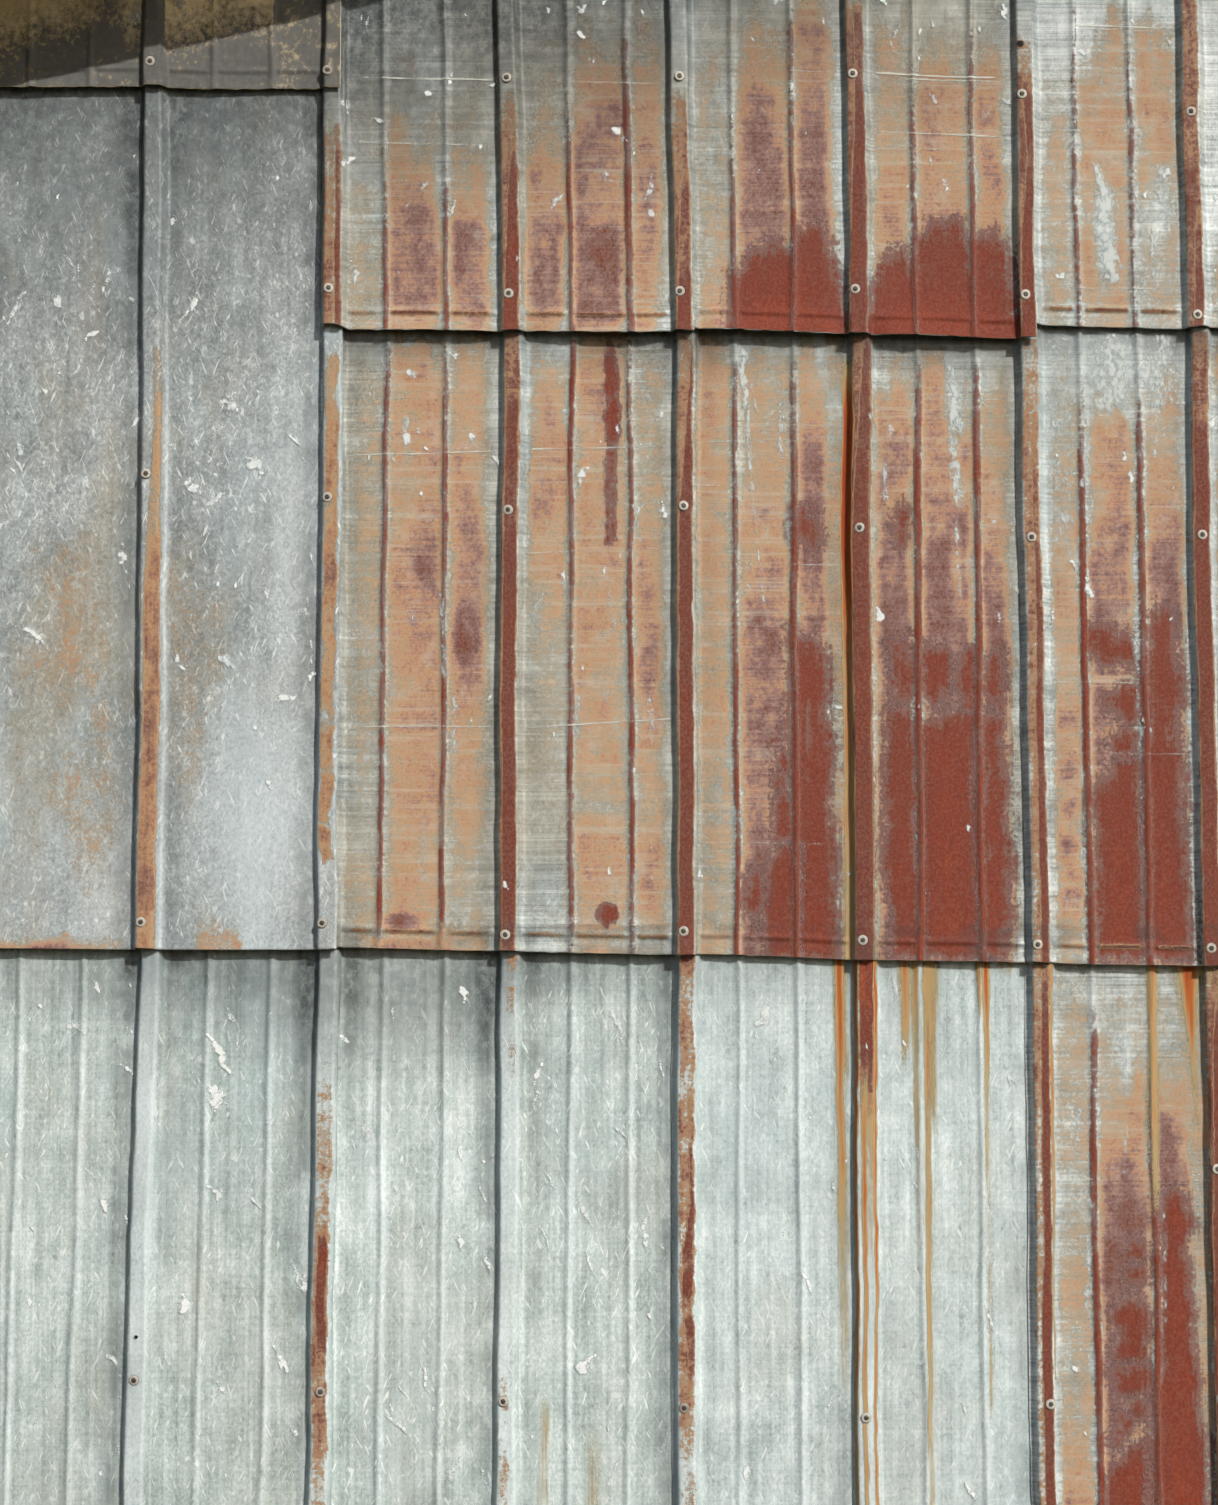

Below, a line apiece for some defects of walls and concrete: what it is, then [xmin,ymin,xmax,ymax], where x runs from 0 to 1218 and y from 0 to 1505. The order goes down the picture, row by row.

rust [0,350,222,949]
rust [318,0,1218,1505]
rust [310,1085,333,1505]